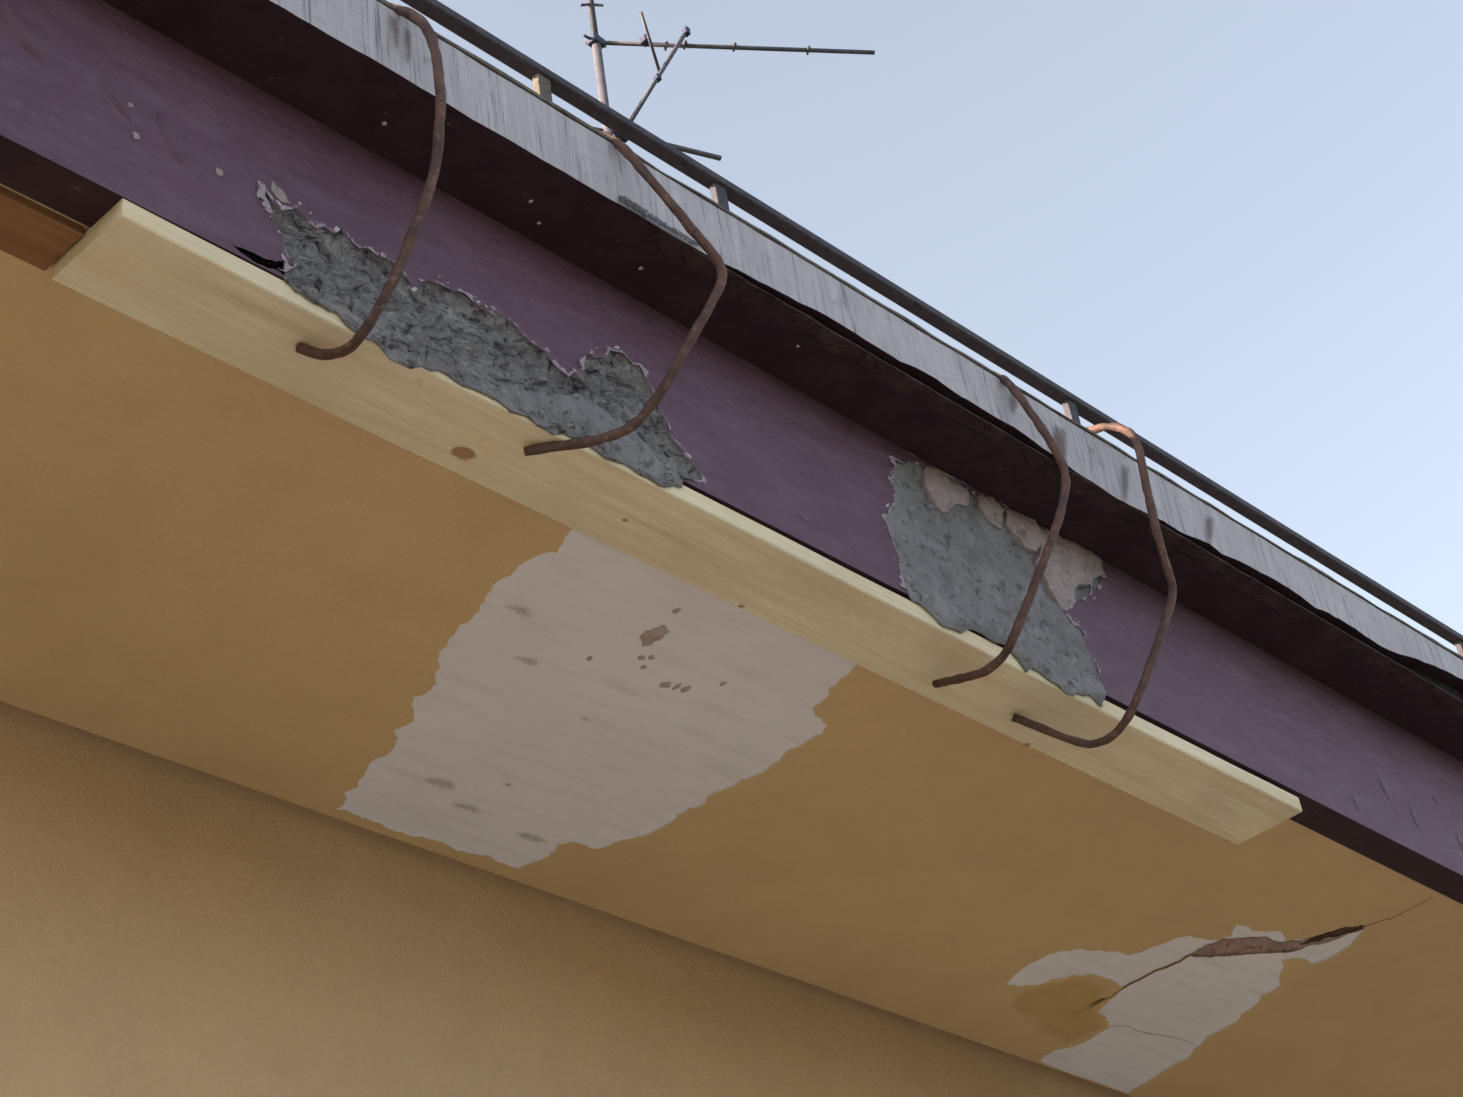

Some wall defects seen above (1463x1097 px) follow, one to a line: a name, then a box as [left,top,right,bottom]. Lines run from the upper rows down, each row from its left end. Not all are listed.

rust [392,18,410,56]
spalling [238,180,707,488]
spalling [642,228,1463,718]
rust [1055,426,1066,457]
peeling [338,529,857,868]
peeling [1006,925,1364,1093]
crack [1061,898,1431,1018]